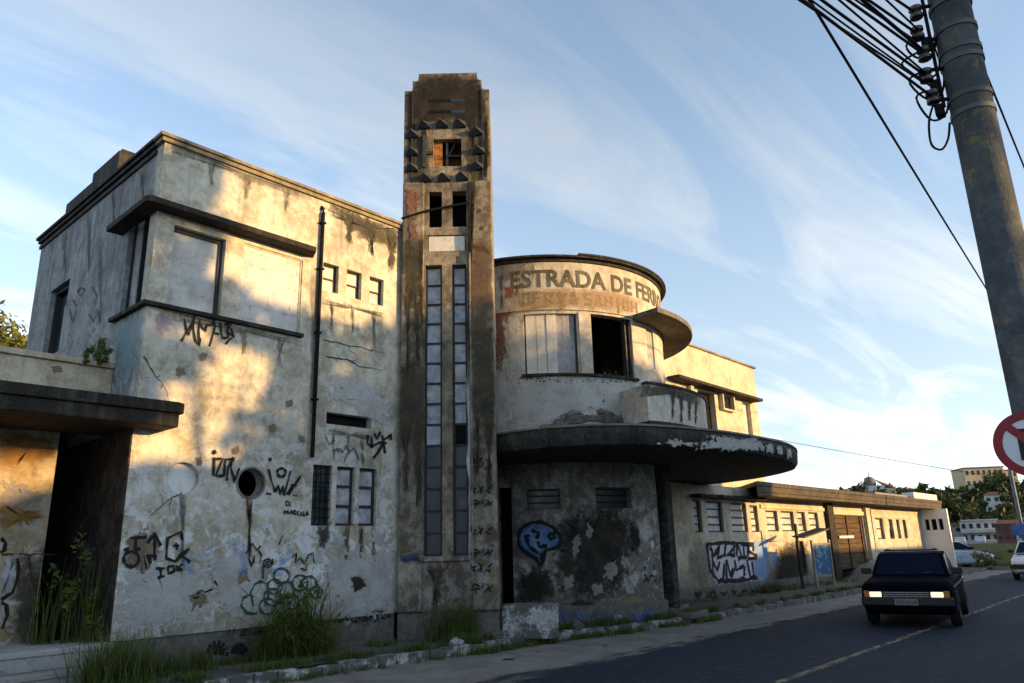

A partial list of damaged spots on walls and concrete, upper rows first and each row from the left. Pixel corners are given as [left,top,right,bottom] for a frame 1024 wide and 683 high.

crack [323,339,384,371]
water stain [333,205,426,506]
peeling [495,312,638,432]
water stain [638,382,699,422]
peeling [657,435,792,459]
water stain [516,506,640,606]
peeling [572,523,594,559]
peeling [591,553,628,596]